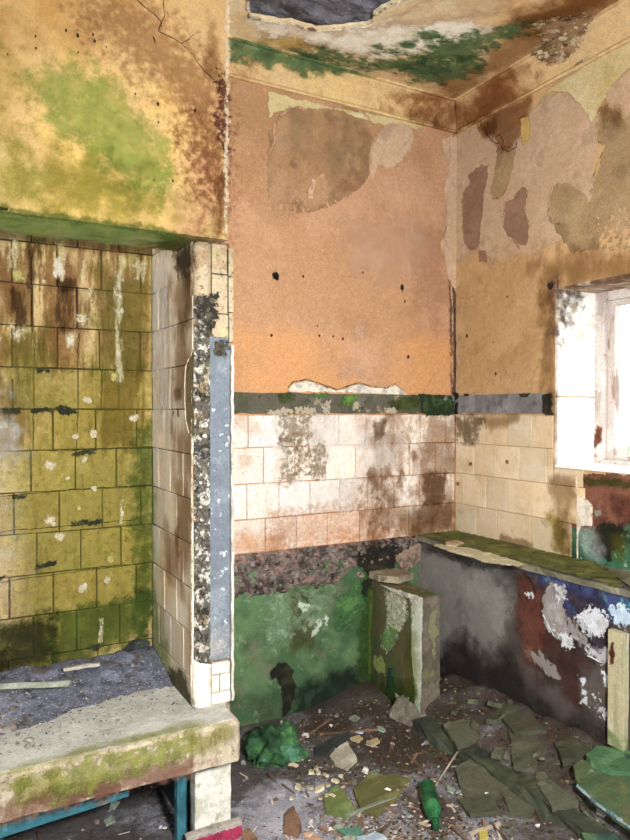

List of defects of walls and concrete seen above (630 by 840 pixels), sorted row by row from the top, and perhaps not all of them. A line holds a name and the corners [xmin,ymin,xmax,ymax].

crack [137,0,220,87]
peeling [249,0,390,26]
damp [228,0,536,85]
flaking render [266,103,415,218]
peeling [440,71,630,293]
flaking render [267,379,407,416]
damp [278,415,328,484]
peeling [524,581,630,721]